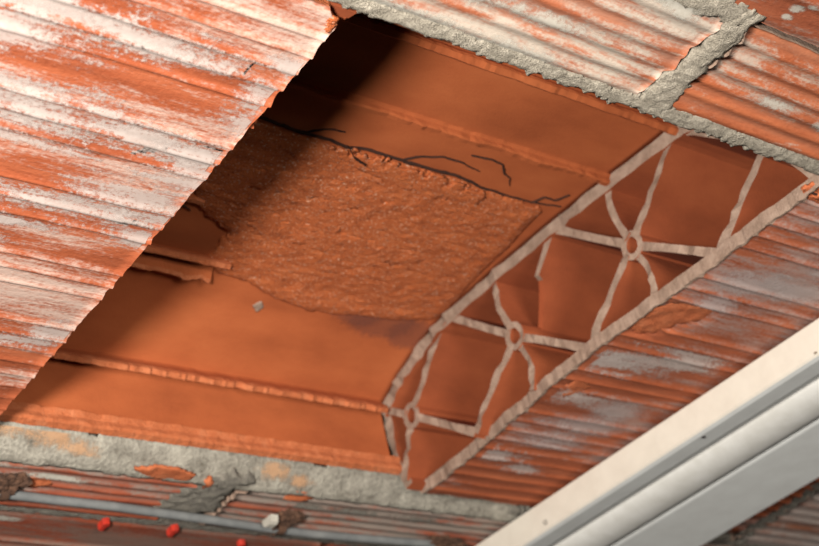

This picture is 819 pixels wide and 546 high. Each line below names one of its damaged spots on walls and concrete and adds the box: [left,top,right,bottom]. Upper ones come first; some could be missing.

peeling [324,15,339,34]
crack [258,116,570,207]
spalling [194,120,542,321]
peeling [631,303,713,334]
spalling [0,402,531,523]